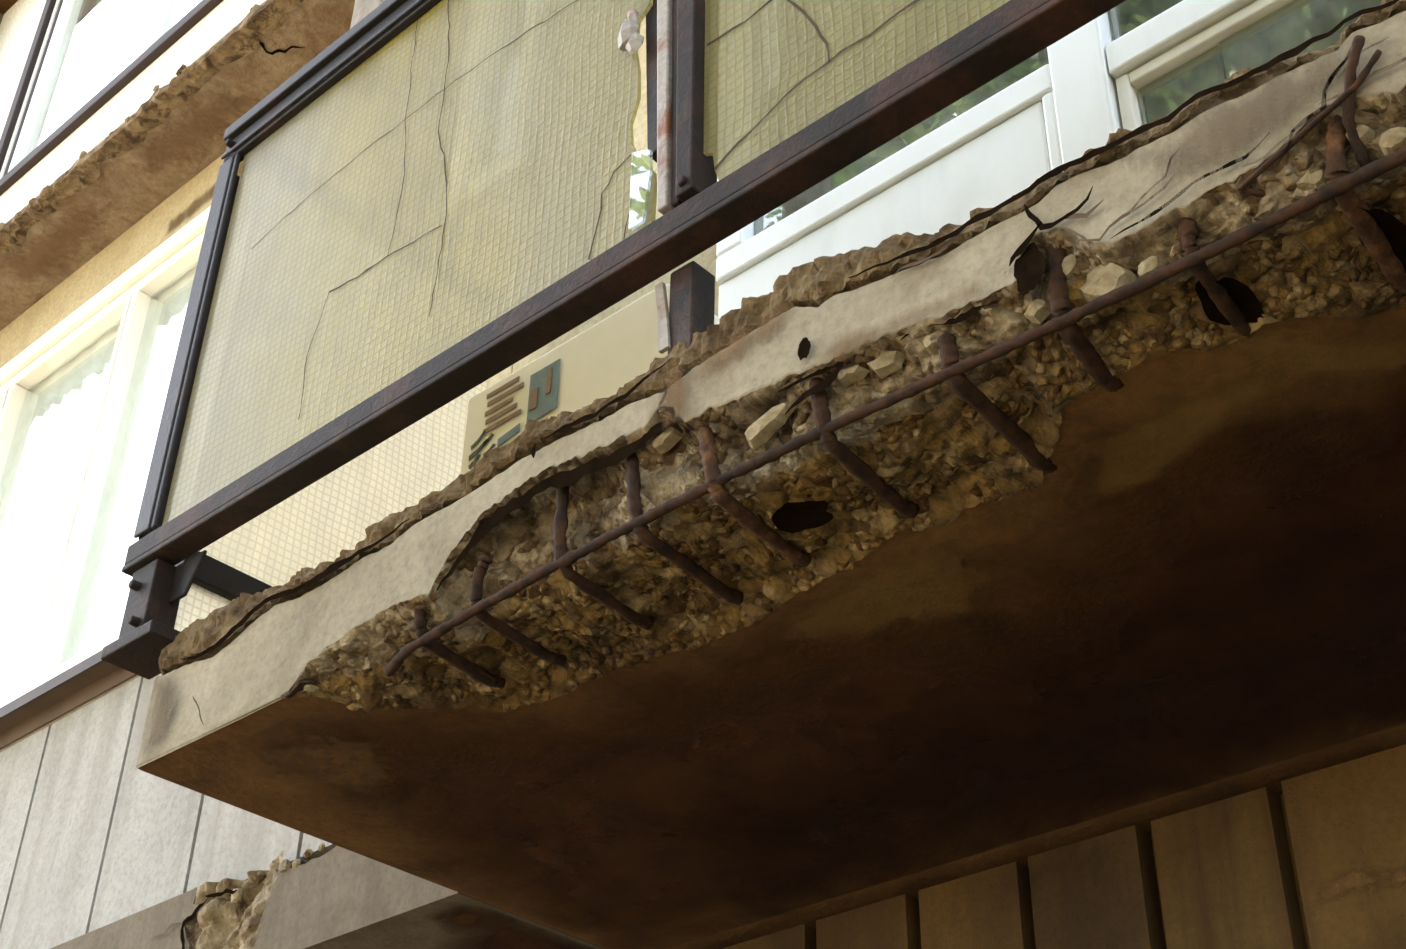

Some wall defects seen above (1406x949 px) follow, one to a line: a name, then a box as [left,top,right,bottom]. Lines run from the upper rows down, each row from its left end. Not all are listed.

crack [259,41,304,55]
spalling [0,0,303,253]
crack [848,0,1406,278]
crack [900,301,997,341]
spalling [281,35,1406,714]
water stain [258,337,1406,930]
water stain [145,679,176,747]
crack [150,888,237,949]
spalling [185,843,326,949]
water stain [437,907,586,949]